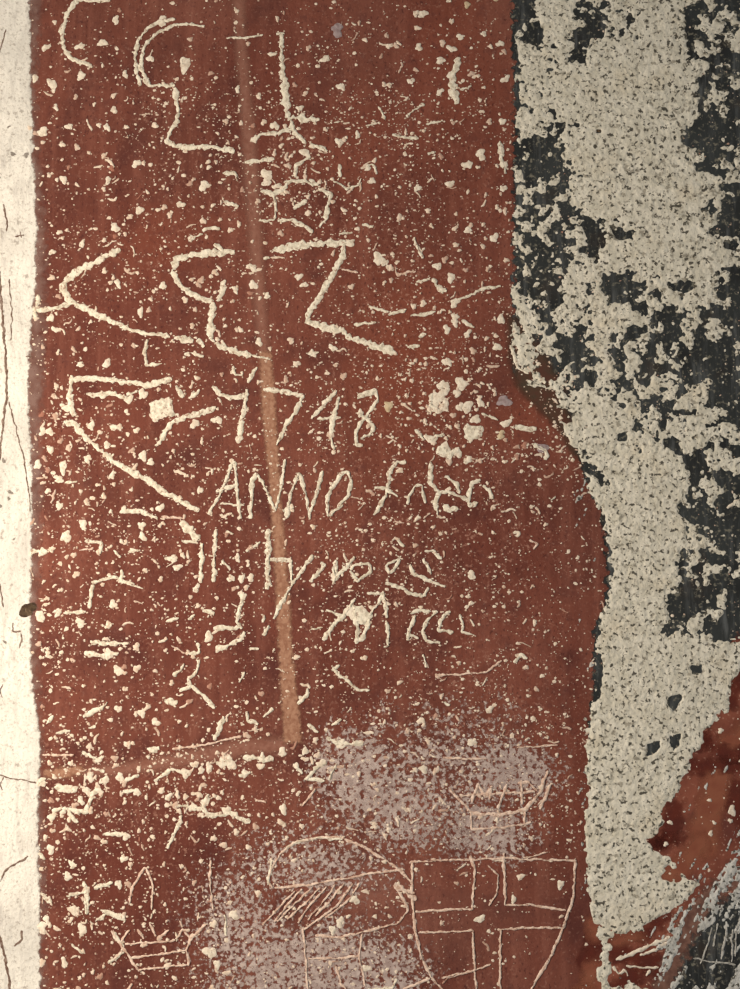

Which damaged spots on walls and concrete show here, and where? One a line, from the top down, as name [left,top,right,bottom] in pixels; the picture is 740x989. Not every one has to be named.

peeling [461,149,485,169]
crack [3,204,24,238]
crack [0,271,32,511]
flaking render [492,0,740,989]
crack [0,585,23,648]
crack [0,774,37,789]
crack [0,856,28,882]
crack [0,930,23,989]